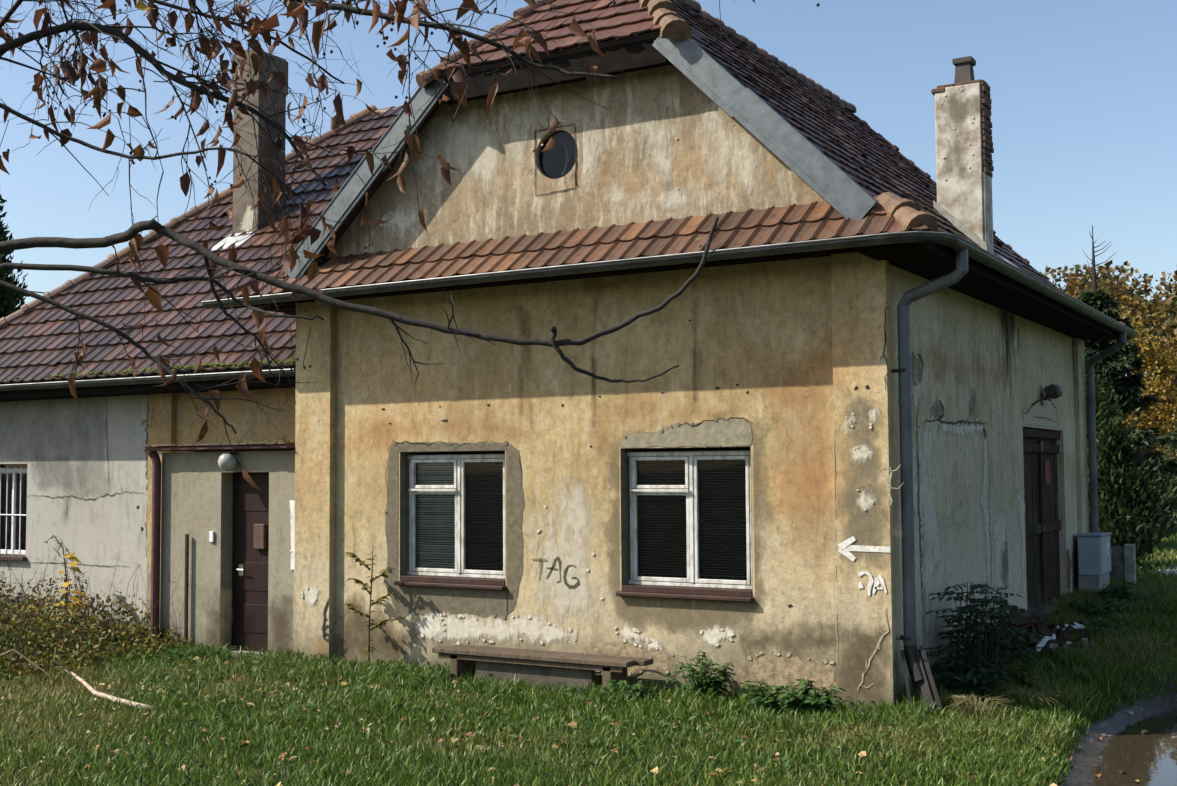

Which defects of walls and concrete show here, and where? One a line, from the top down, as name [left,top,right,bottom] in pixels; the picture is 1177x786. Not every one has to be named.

leakage [1001,310,1019,372]
crack [33,400,144,516]
peeling [415,480,676,677]
peeling [852,446,873,461]
peeling [857,489,874,511]
peeling [878,352,987,636]
peeling [993,491,1025,600]
peeling [700,626,735,647]